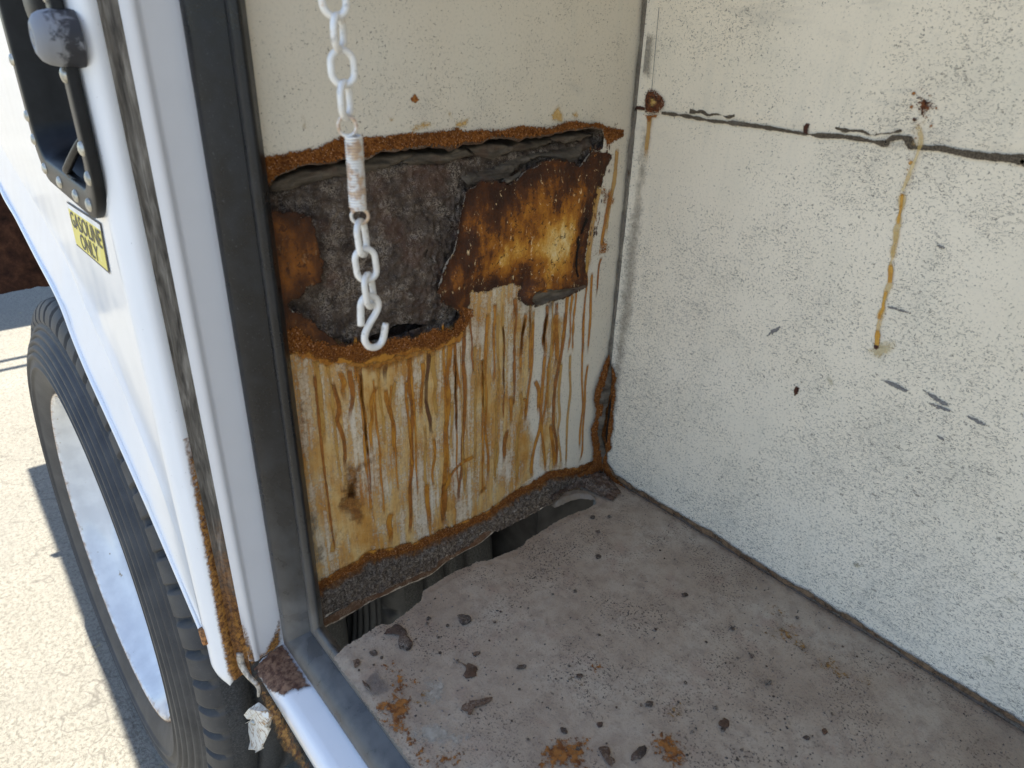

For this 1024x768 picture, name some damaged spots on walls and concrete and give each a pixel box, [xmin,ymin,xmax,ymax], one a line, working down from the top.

crack [661,109,1024,167]
rust [265,0,1024,733]
rust [184,438,310,768]